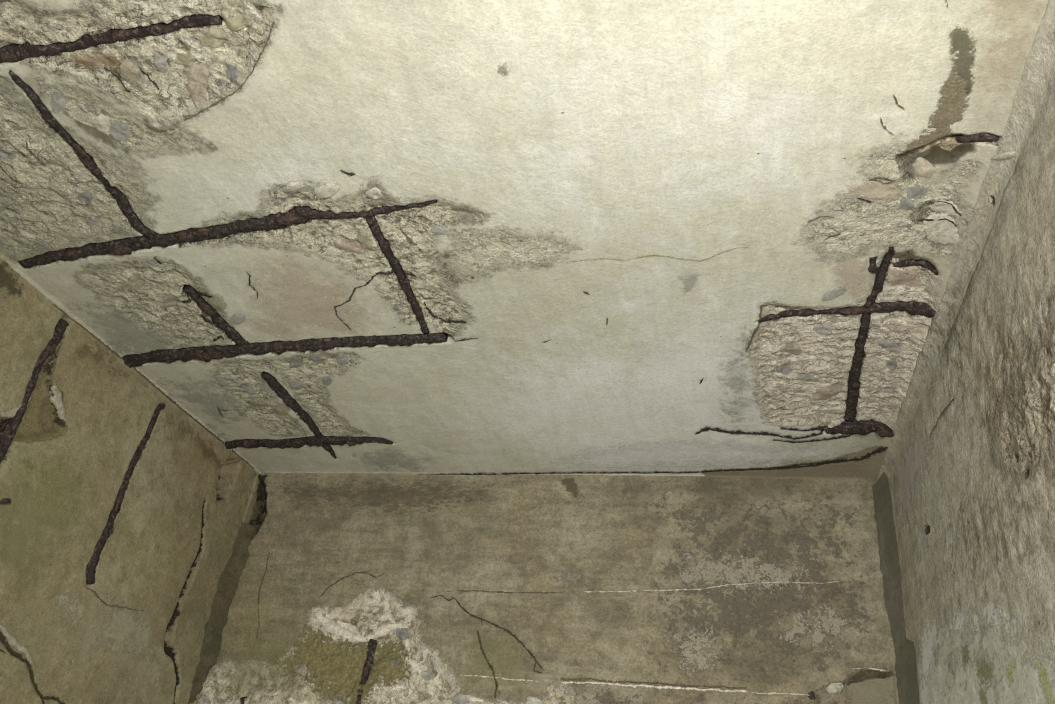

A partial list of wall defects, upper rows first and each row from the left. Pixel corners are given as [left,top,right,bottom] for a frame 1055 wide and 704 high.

water stain [896,27,977,161]
spalling [0,0,582,464]
spalling [746,133,1002,438]
crack [53,304,254,469]
crack [0,624,65,704]
crack [90,589,145,611]
crack [164,475,223,704]
spalling [198,586,650,704]
crack [431,595,544,698]
peeling [650,492,873,679]
spalling [786,681,851,704]